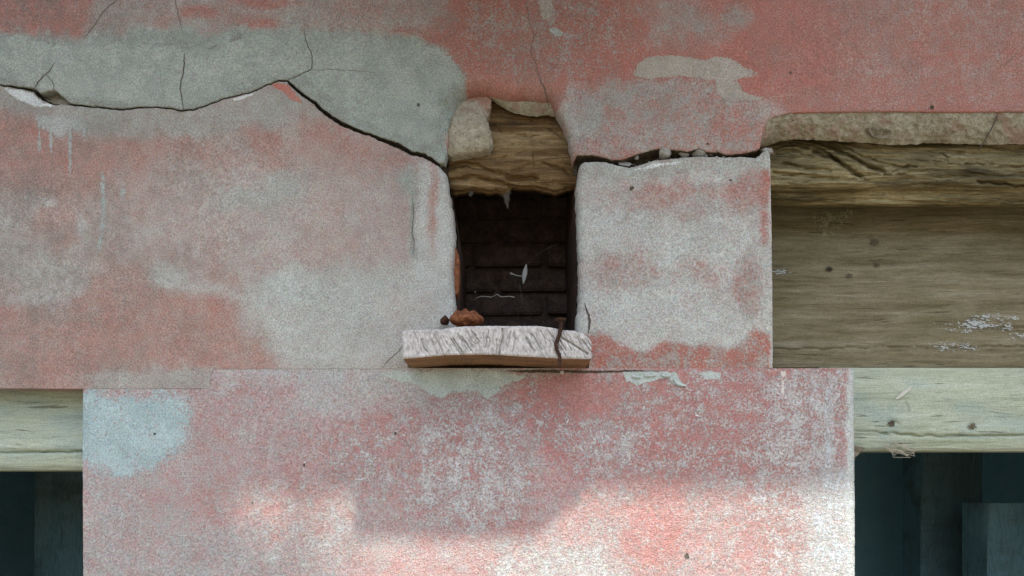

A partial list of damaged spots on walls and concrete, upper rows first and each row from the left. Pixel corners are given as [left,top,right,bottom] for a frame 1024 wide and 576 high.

crack [35,65,54,104]
spalling [39,93,73,106]
crack [178,53,186,109]
peeling [272,83,301,103]
crack [288,28,374,132]
flaking render [634,55,762,102]
spalling [448,97,556,162]
crack [378,140,447,173]
peeling [623,370,686,386]
peeling [379,368,528,518]